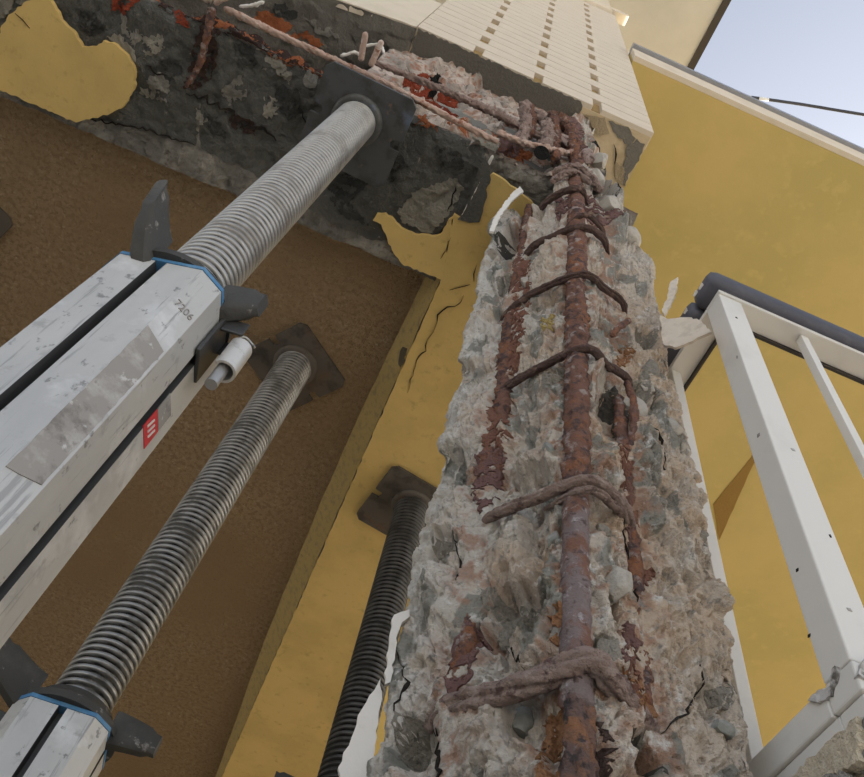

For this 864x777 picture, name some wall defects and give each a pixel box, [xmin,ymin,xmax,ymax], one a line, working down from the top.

rust [157,0,324,90]
spalling [54,0,609,241]
rust [403,72,533,165]
spalling [489,187,533,298]
crack [409,265,477,388]
rust [471,406,514,514]
spalling [492,310,515,418]
spalling [557,175,629,654]
flaking render [635,277,712,350]
flaking render [337,610,410,777]
rust [621,621,659,718]
rust [595,722,618,777]